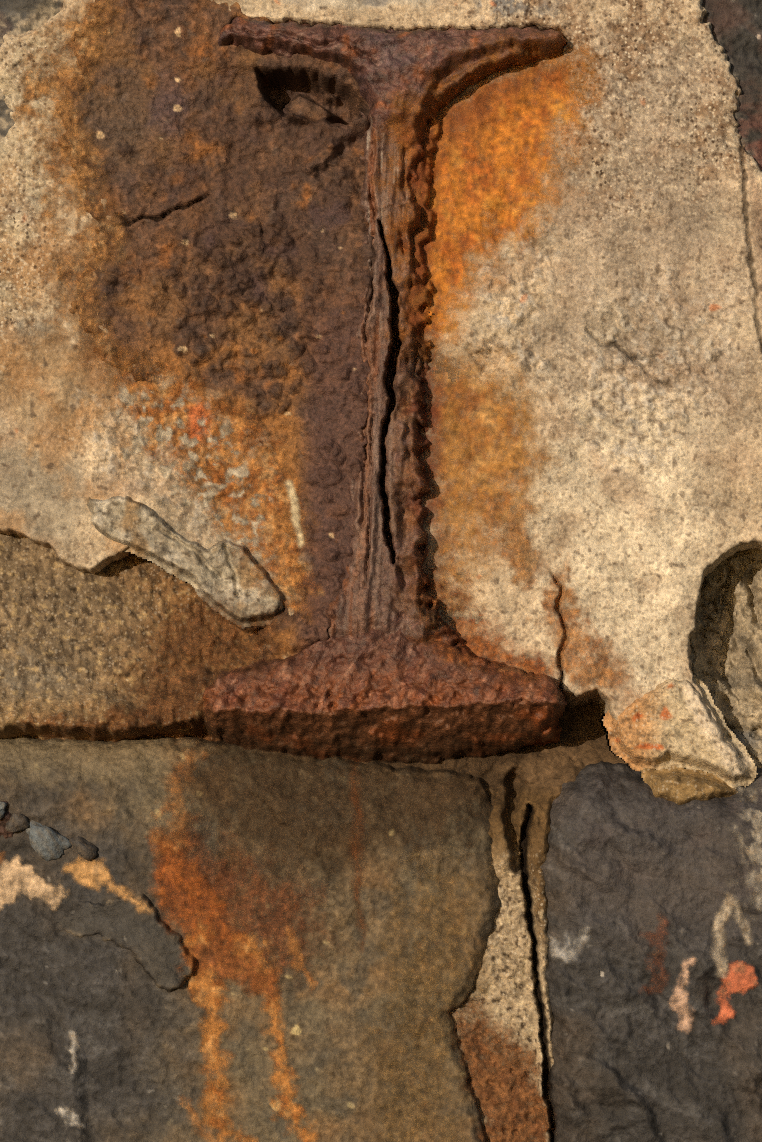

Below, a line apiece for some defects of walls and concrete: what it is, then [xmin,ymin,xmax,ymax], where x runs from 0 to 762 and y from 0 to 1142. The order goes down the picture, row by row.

corrosion [17,0,627,729]
spalling [0,496,285,742]
spalling [690,549,762,768]
corrosion [150,832,316,1142]
corrosion [454,1006,552,1142]
crack [520,805,554,1142]